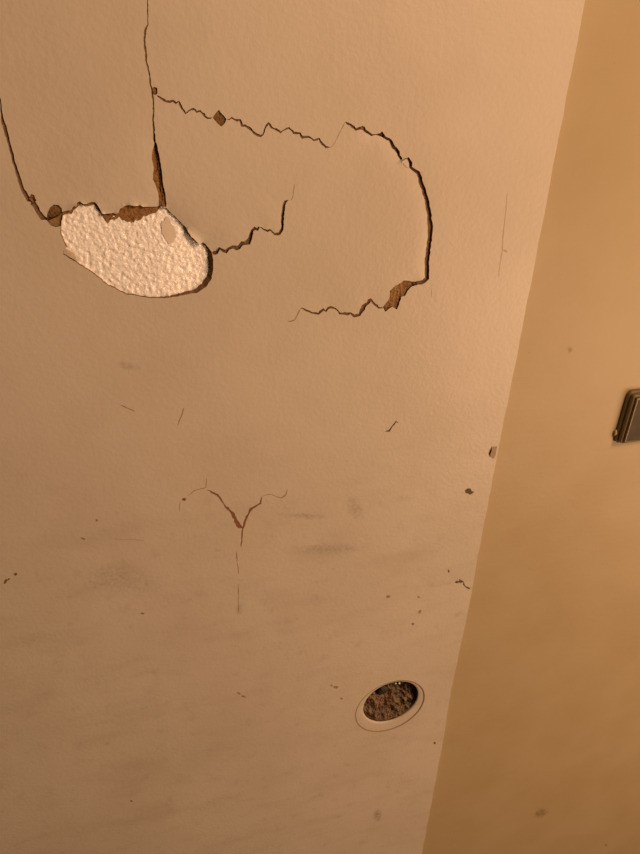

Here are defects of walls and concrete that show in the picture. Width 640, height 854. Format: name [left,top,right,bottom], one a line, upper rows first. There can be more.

crack [0,99,47,220]
crack [144,0,433,285]
spalling [46,201,213,298]
crack [289,298,382,322]
crack [179,478,288,612]